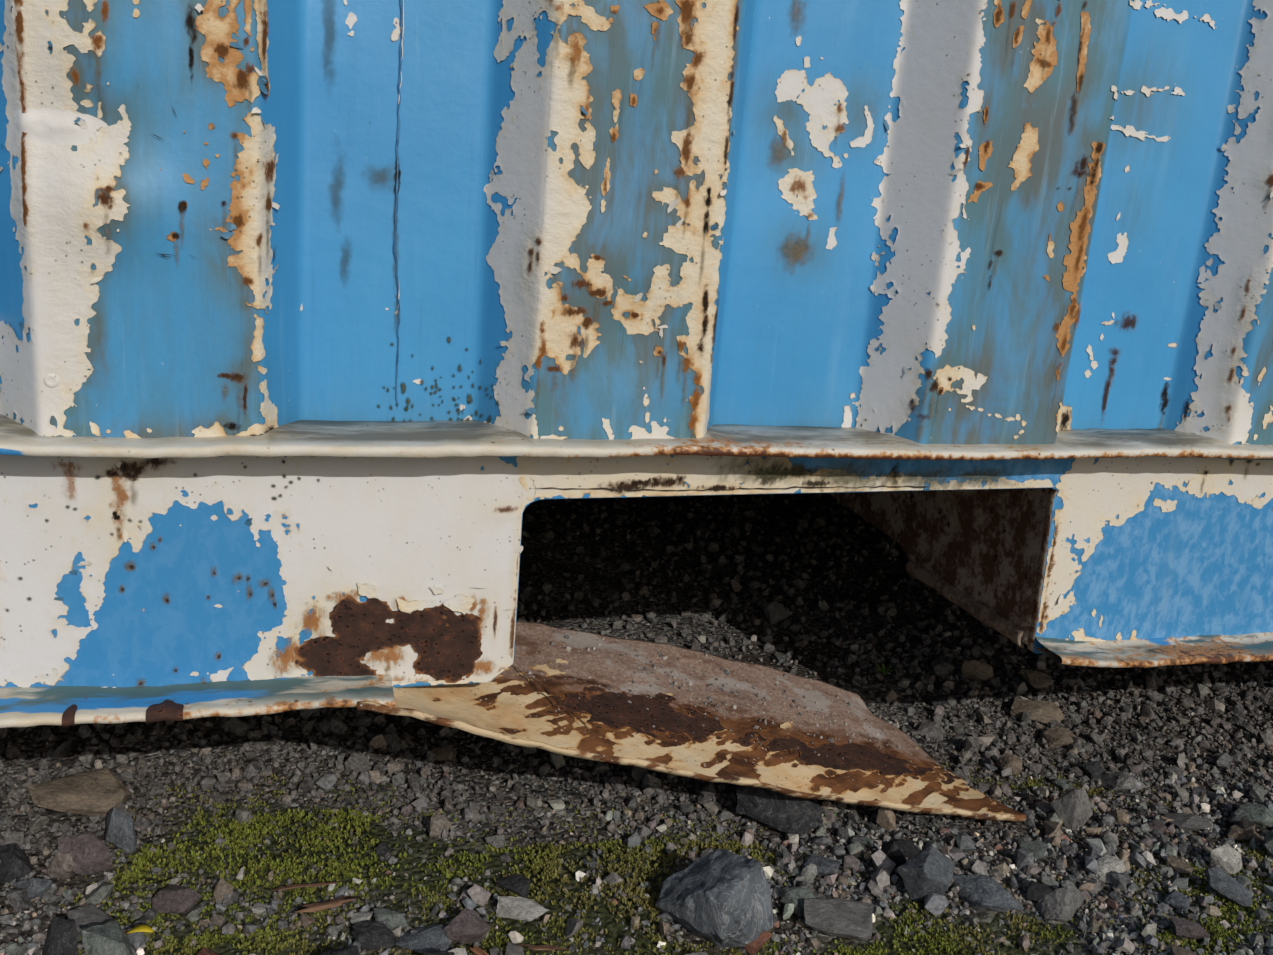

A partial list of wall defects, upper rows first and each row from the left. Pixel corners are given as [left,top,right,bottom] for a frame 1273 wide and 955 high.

peeling [0,0,132,437]
rust [186,8,196,77]
peeling [192,0,280,437]
rust [235,11,269,97]
rust [265,160,275,181]
peeling [460,0,739,440]
peeling [773,0,1027,439]
rust [1058,142,1103,189]
peeling [1174,0,1273,444]
rust [273,582,515,683]
peeling [0,455,1273,816]
rust [537,686,962,784]